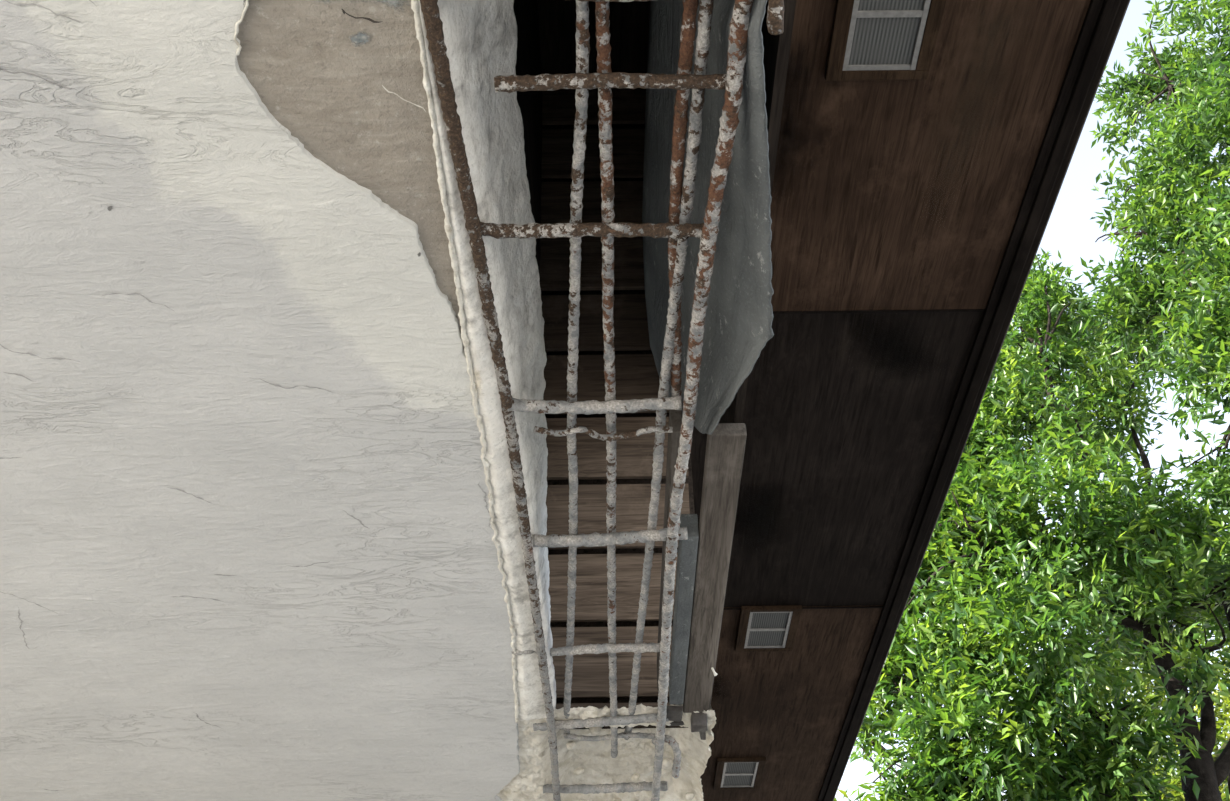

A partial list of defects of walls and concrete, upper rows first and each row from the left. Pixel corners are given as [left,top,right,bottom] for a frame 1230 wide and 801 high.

spalling [234,0,754,801]
spalling [766,0,784,35]